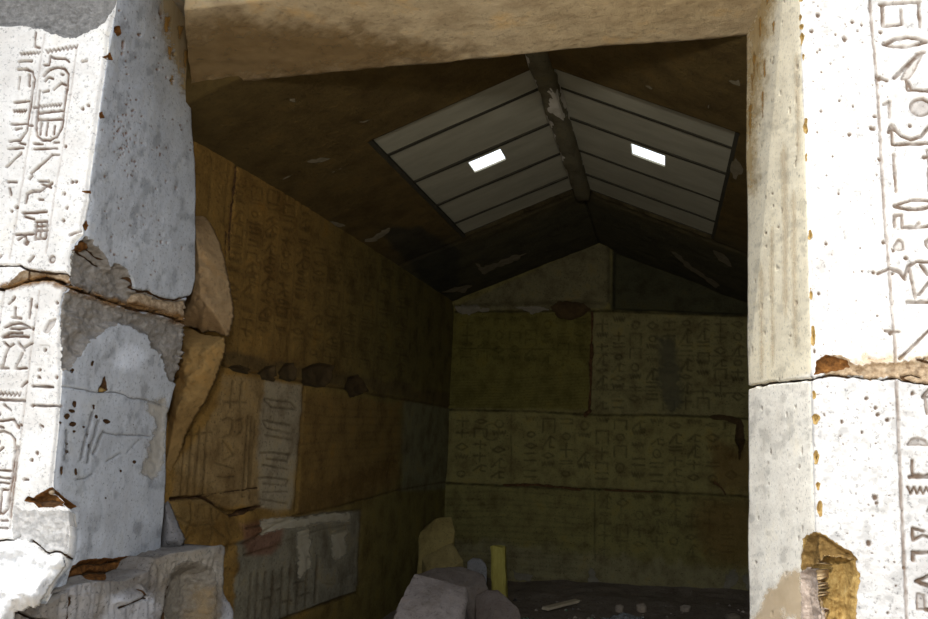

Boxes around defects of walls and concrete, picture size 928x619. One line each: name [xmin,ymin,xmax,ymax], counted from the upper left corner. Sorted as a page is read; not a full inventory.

crack [0,249,185,324]
spalling [10,220,186,383]
crack [753,359,928,388]
spalling [814,355,928,385]
peeling [132,398,168,479]
spalling [800,532,860,619]